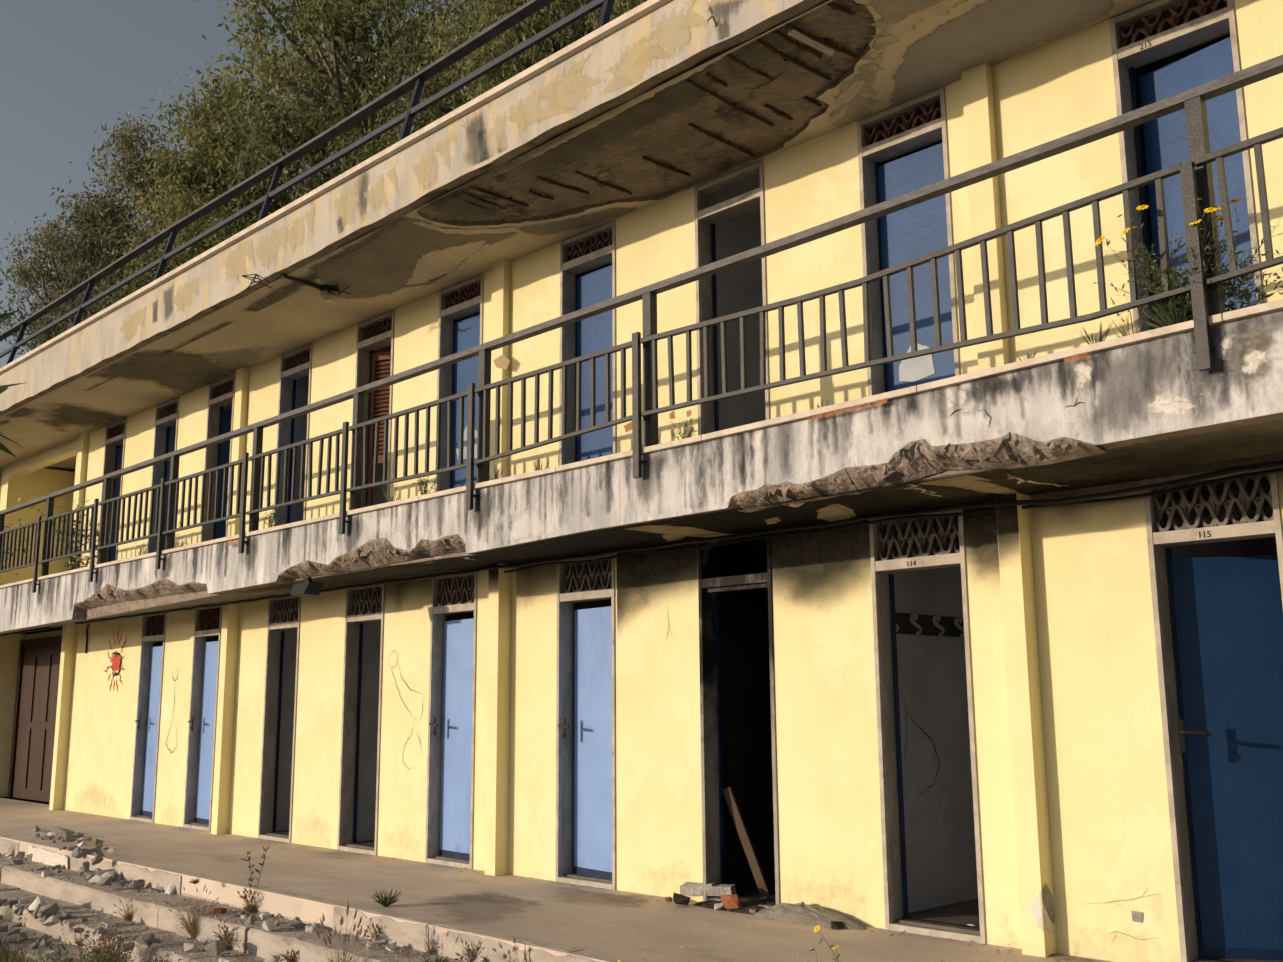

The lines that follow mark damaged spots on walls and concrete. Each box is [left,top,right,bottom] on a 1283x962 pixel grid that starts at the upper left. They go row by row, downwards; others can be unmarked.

spalling [311,0,1114,299]
leakage [965,375,1025,408]
leakage [1059,341,1176,422]
leakage [1191,317,1281,404]
spalling [727,344,1106,525]
leakage [626,457,664,496]
leakage [870,433,1283,505]
spalling [279,514,466,579]
leakage [5,560,138,616]
spalling [74,578,207,610]
peeling [1029,883,1055,934]
crack [1089,888,1162,943]